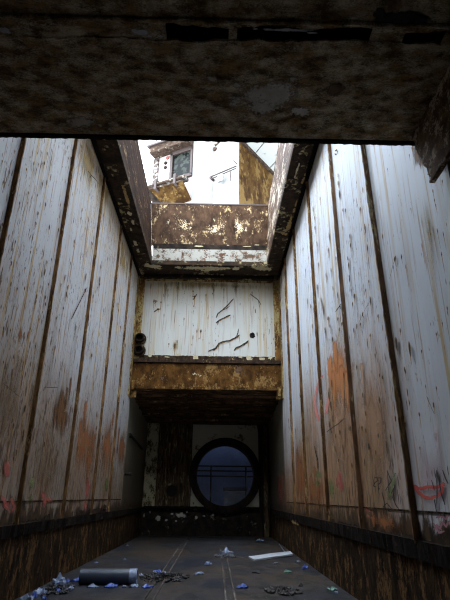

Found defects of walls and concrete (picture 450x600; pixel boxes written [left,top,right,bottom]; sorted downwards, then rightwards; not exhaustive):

peeling [235,246,271,271]
crack [216,299,233,325]
crack [209,329,249,355]
rust [317,285,353,472]
rust [77,402,125,482]